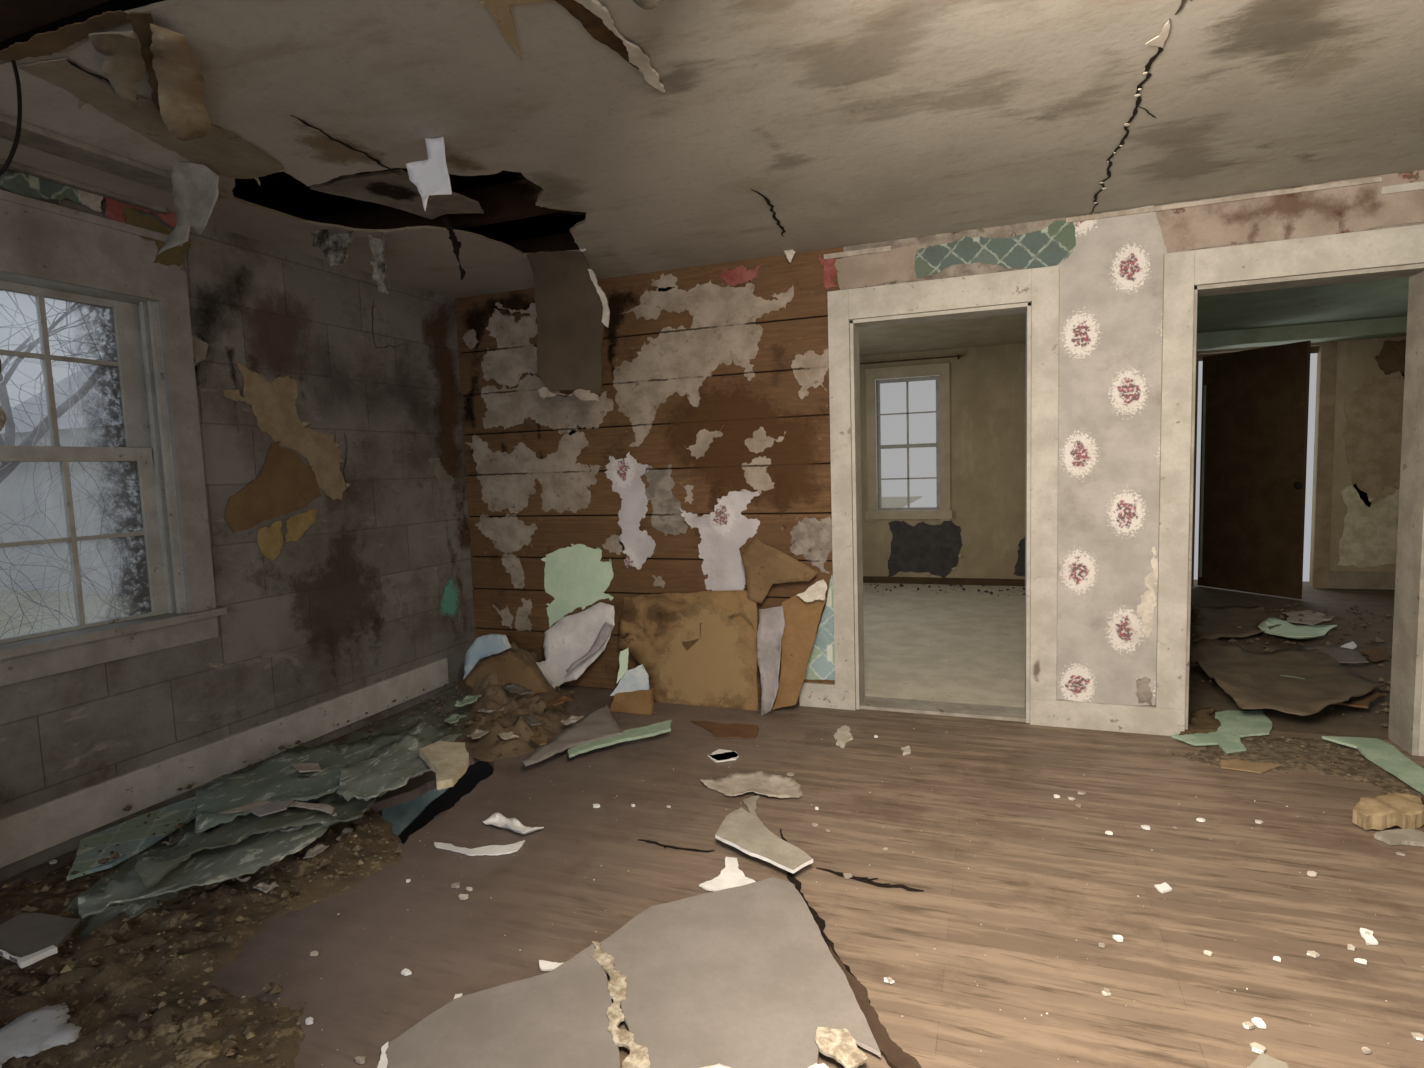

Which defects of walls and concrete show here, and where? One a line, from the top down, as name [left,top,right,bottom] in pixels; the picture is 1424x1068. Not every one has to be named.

peeling [17,57,284,186]
crack [1090,0,1192,214]
damp [195,267,244,343]
flaking render [257,509,318,560]
damp [291,535,383,656]
peeling [541,544,628,627]
flaking render [886,520,962,578]